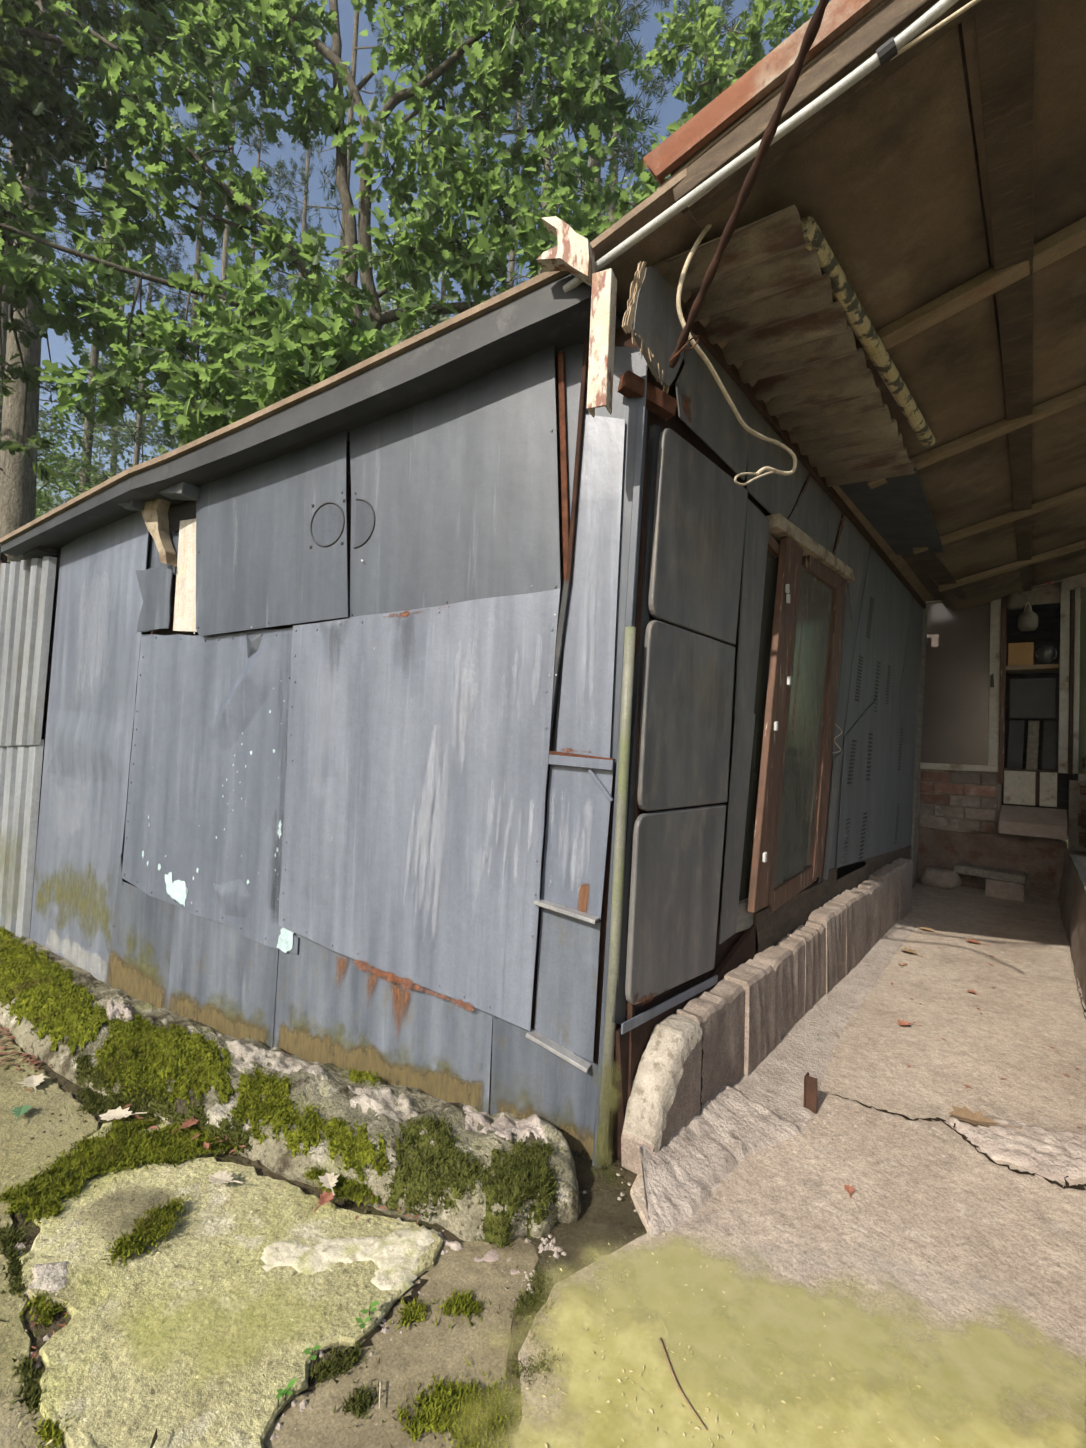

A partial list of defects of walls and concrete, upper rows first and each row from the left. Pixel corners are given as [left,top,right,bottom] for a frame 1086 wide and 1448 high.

corrosion [643,0,883,185]
peeling [142,851,199,907]
peeling [277,928,294,953]
corrosion [337,958,474,1028]
crack [1071,961,1086,1018]
crack [821,1091,1086,1190]